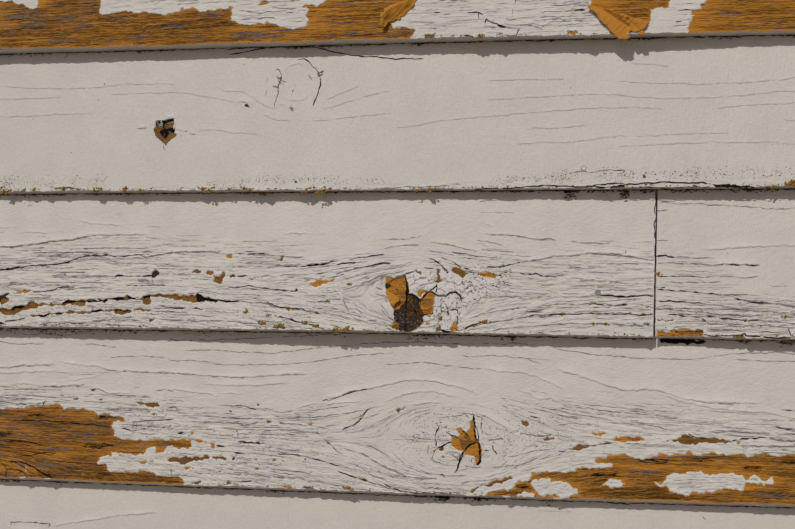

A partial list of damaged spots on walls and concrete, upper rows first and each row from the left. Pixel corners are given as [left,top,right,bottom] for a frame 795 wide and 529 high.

peeling [0,0,415,49]
peeling [592,0,670,36]
peeling [688,0,795,33]
peeling [154,119,175,144]
peeling [193,269,235,284]
peeling [0,289,218,321]
peeling [385,267,468,332]
crack [0,226,795,494]
peeling [0,395,235,485]
peeling [439,420,482,465]
peeling [592,432,645,443]
peeling [466,434,795,505]